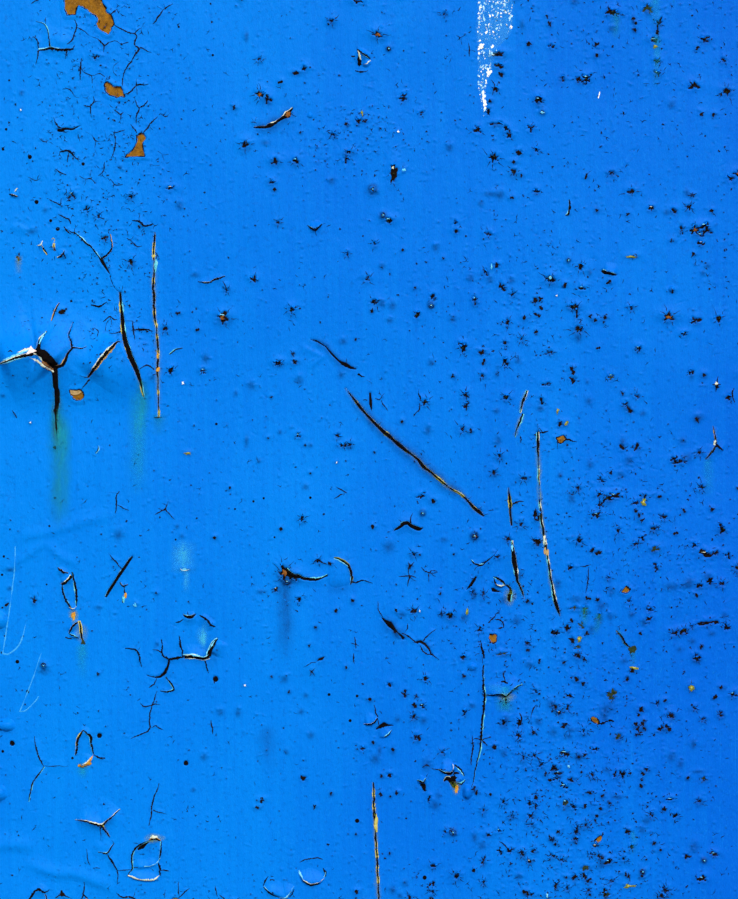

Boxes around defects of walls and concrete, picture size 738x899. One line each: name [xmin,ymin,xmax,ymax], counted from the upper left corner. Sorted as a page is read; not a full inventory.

peeling [59,0,120,39]
peeling [120,127,151,163]
rust [299,105,434,178]
rust [14,125,173,372]
crack [0,0,203,458]
rust [479,287,550,375]
crack [105,555,154,608]
rust [459,395,738,899]
crack [123,639,190,761]
crack [48,779,240,899]
peeling [127,833,168,883]
peeling [260,855,330,899]